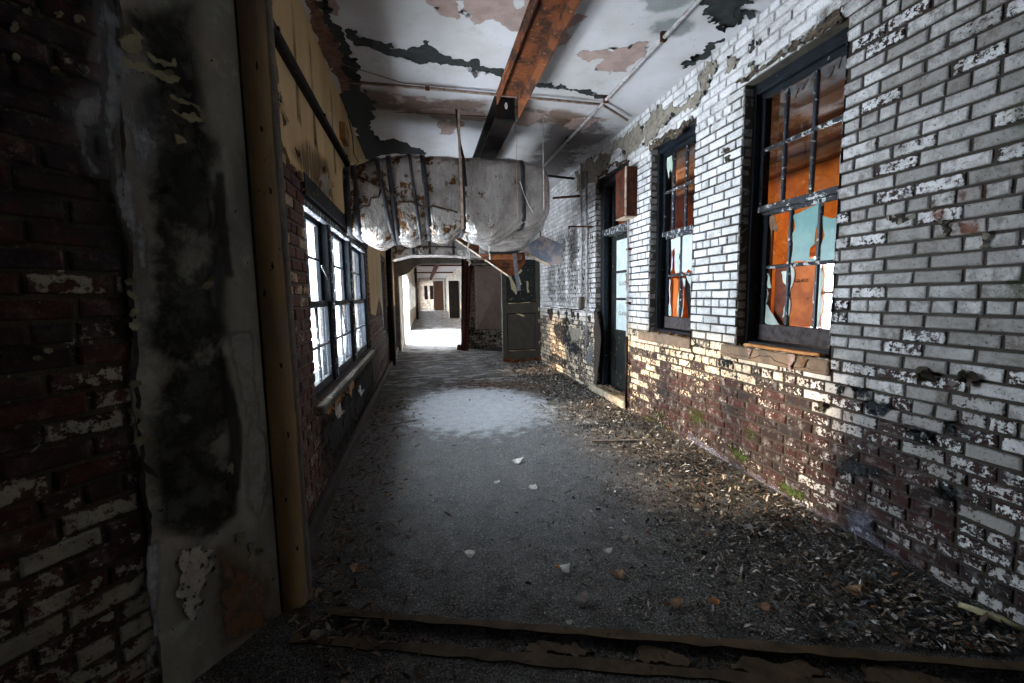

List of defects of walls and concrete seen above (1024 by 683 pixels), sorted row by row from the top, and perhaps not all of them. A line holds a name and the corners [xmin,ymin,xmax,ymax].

peeling [426,0,529,32]
peeling [555,13,587,51]
peeling [415,96,486,135]
spalling [575,6,845,193]
damp [76,6,266,537]
peeling [786,354,808,371]
peeling [835,384,892,416]
peeling [904,420,955,441]
spalling [175,544,217,621]